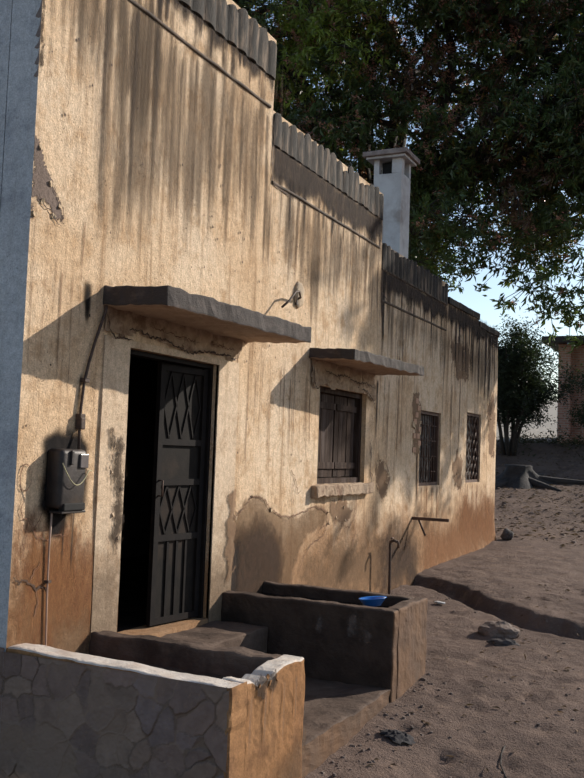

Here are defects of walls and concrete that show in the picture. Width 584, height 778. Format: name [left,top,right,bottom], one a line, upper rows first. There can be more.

flaking render [31,136,64,226]
leakage [74,0,498,399]
flaking render [105,306,247,363]
flaking render [299,359,376,408]
flaking render [412,393,422,456]
flaking render [375,459,390,500]
flaking render [452,449,464,490]
leakage [231,523,282,593]
leakage [233,495,330,577]
spalling [255,669,279,700]